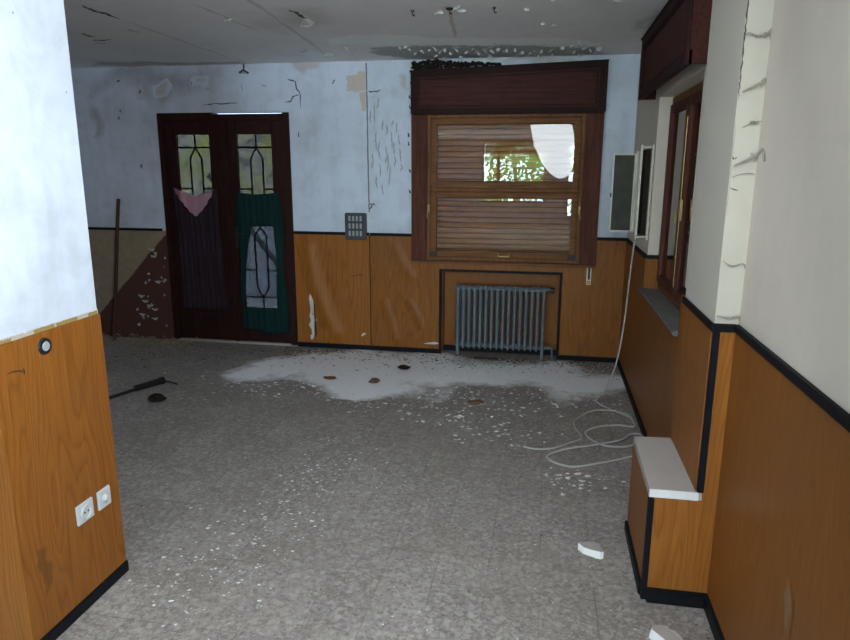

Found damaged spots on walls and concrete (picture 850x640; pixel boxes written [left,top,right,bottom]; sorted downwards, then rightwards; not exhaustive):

crack [80,5,237,60]
peeling [288,34,609,79]
crack [284,79,301,109]
flaking render [345,70,366,112]
crack [726,0,749,217]
crack [365,63,381,212]
peeling [0,226,175,345]